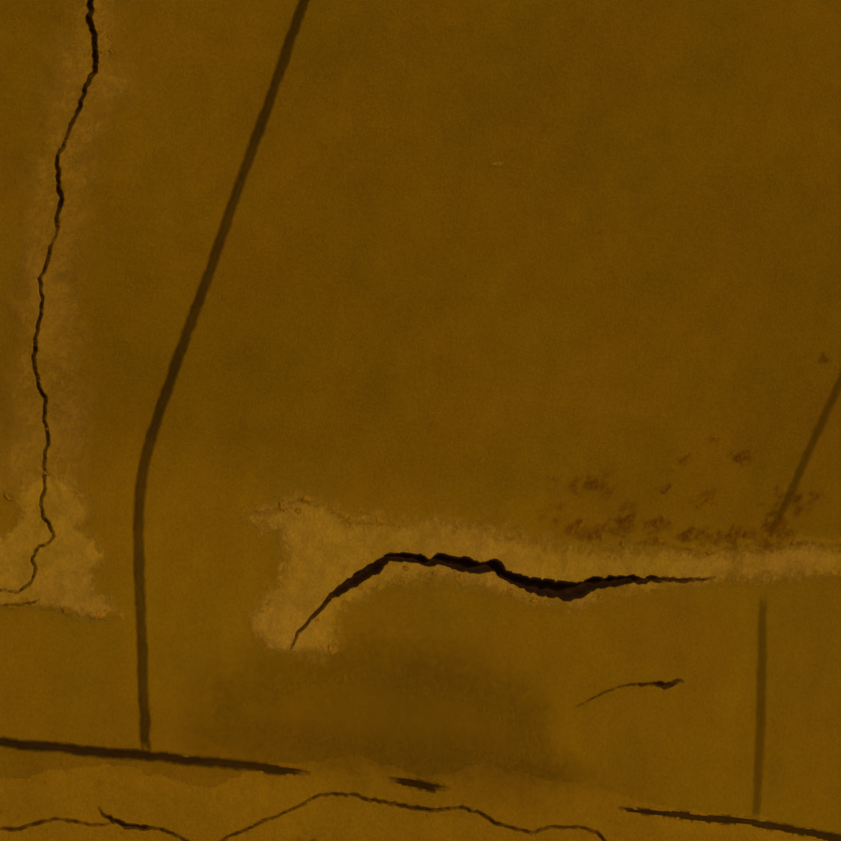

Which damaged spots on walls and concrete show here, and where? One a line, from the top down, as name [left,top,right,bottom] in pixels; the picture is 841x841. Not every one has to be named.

crack [32,0,104,533]
crack [292,552,706,645]
crack [638,680,678,689]
crack [8,816,185,840]